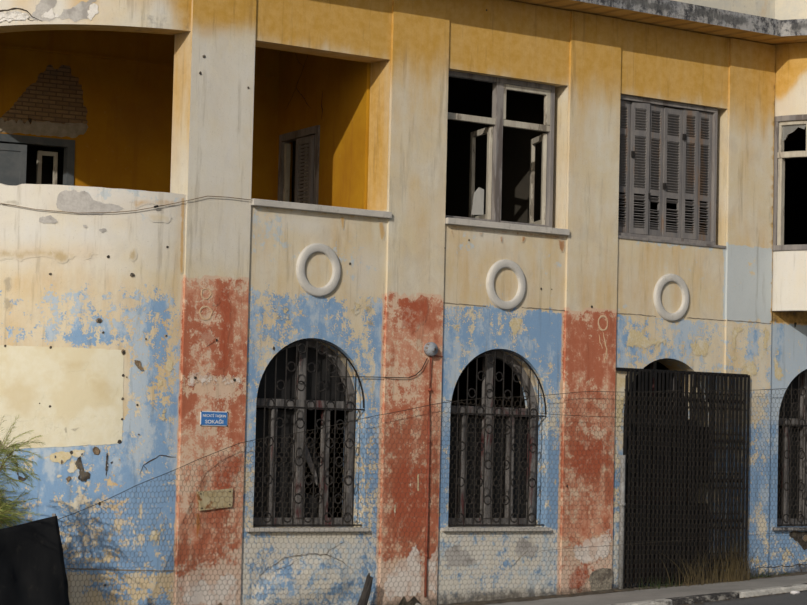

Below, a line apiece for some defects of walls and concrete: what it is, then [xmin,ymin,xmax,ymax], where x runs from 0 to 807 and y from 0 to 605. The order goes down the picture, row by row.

flaking render [0,0,99,22]
leakage [688,6,749,27]
leakage [786,21,807,34]
flaking render [0,65,88,138]
flaking render [39,189,124,224]
peeling [509,318,523,337]
flaking render [49,447,113,482]
spalling [789,531,807,550]